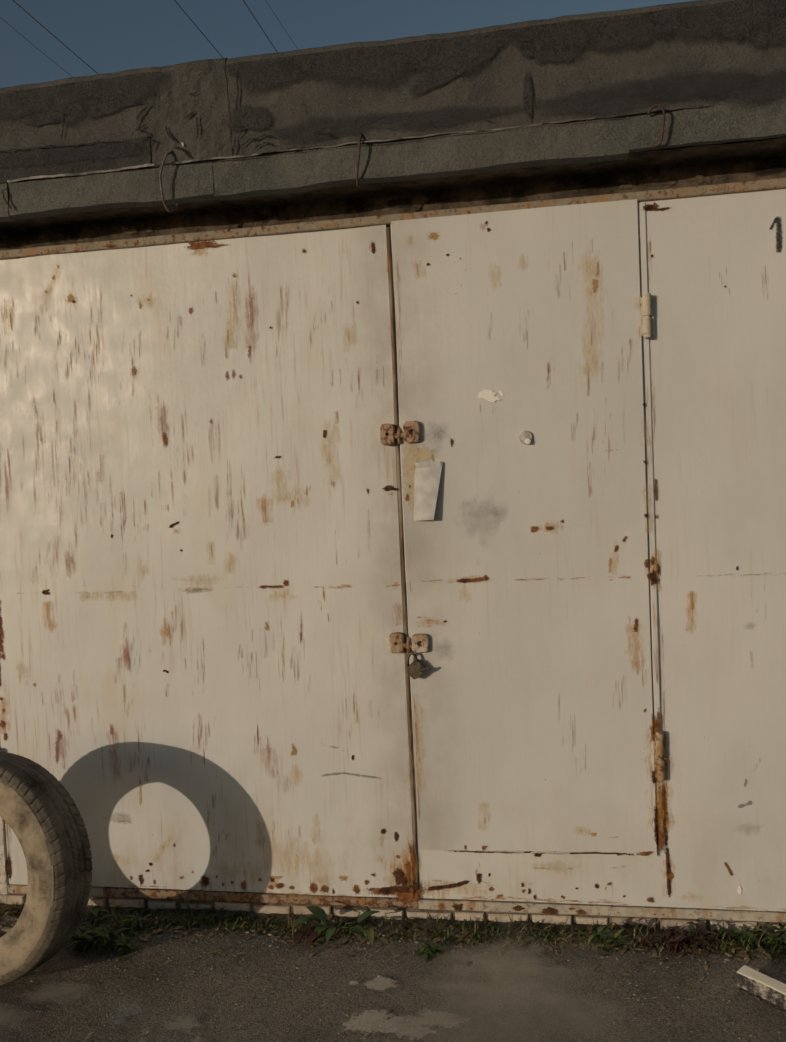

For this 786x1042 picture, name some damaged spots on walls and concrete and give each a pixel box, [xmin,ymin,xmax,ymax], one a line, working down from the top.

rust [184,239,225,250]
rust [457,575,489,583]
rust [644,552,660,586]
rust [643,665,665,743]
rust [444,770,674,897]
rust [180,829,426,905]
rust [439,873,611,916]